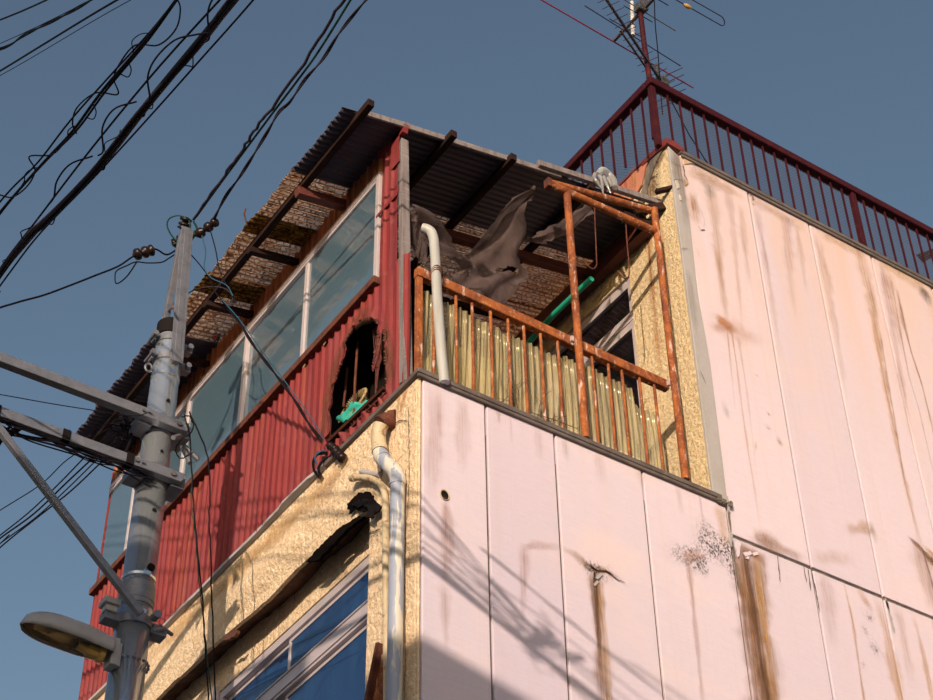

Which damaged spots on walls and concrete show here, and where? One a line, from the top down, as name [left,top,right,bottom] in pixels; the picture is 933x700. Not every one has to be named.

spalling [307,491,382,563]
damp [686,529,735,587]
corrosion [585,563,607,686]
corrosion [737,550,776,700]